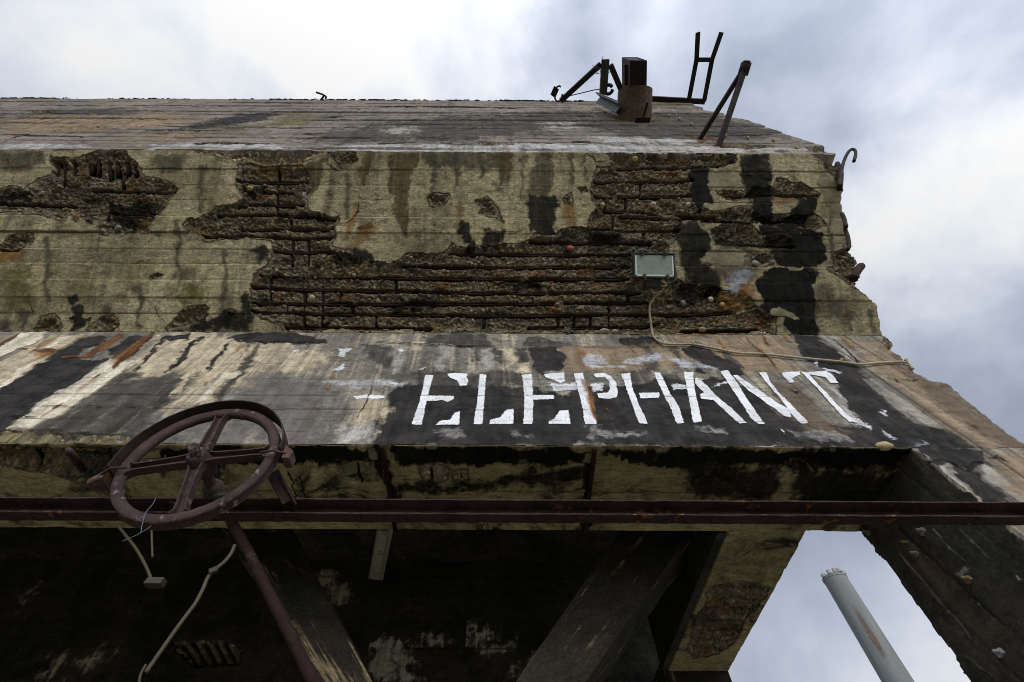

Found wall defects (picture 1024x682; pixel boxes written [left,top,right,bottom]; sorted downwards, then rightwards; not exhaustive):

spalling [807,146,857,193]
spalling [0,151,178,237]
spalling [0,233,34,253]
spalling [184,141,826,335]
spalling [827,211,866,295]
spalling [34,314,62,332]
spalling [86,315,119,332]
spalling [166,305,209,332]
damp [0,103,1024,502]
rust [0,331,155,368]
spalling [686,580,768,658]